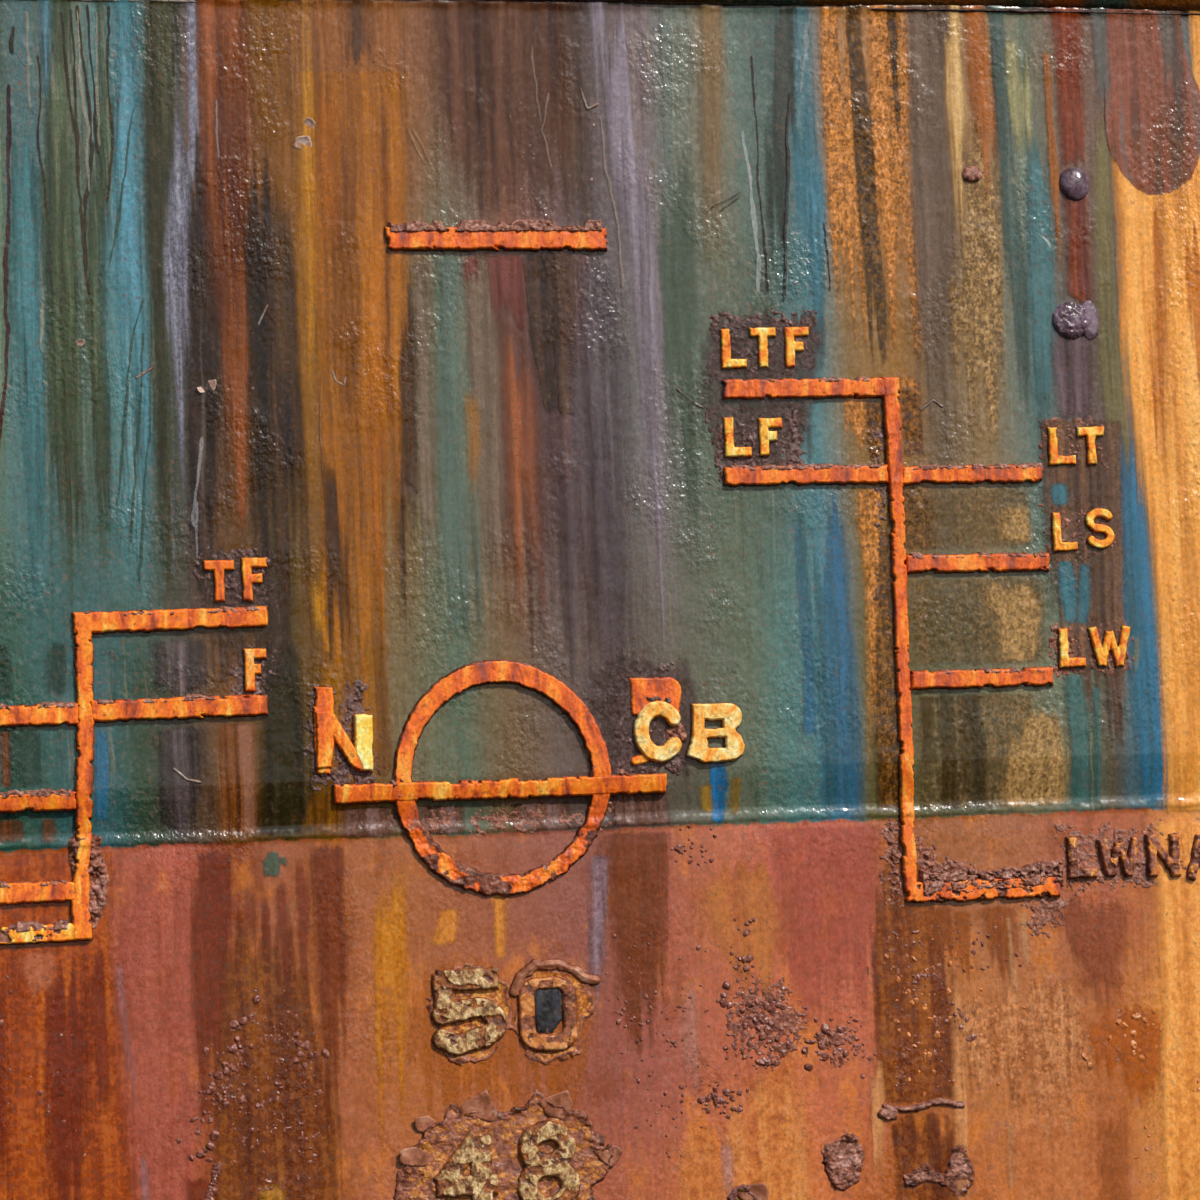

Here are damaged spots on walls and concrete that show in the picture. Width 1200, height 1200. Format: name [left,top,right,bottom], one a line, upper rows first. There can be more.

corrosion [703,4,720,194]
corrosion [820,6,865,329]
corrosion [869,5,919,350]
corrosion [945,5,1003,438]
corrosion [1043,7,1092,302]
damp [1092,8,1109,90]
corrosion [1192,11,1200,91]
corrosion [298,0,602,837]
corrosion [0,820,136,1200]
corrosion [177,923,337,1200]
corrosion [374,882,407,1099]
corrosion [390,1089,623,1200]